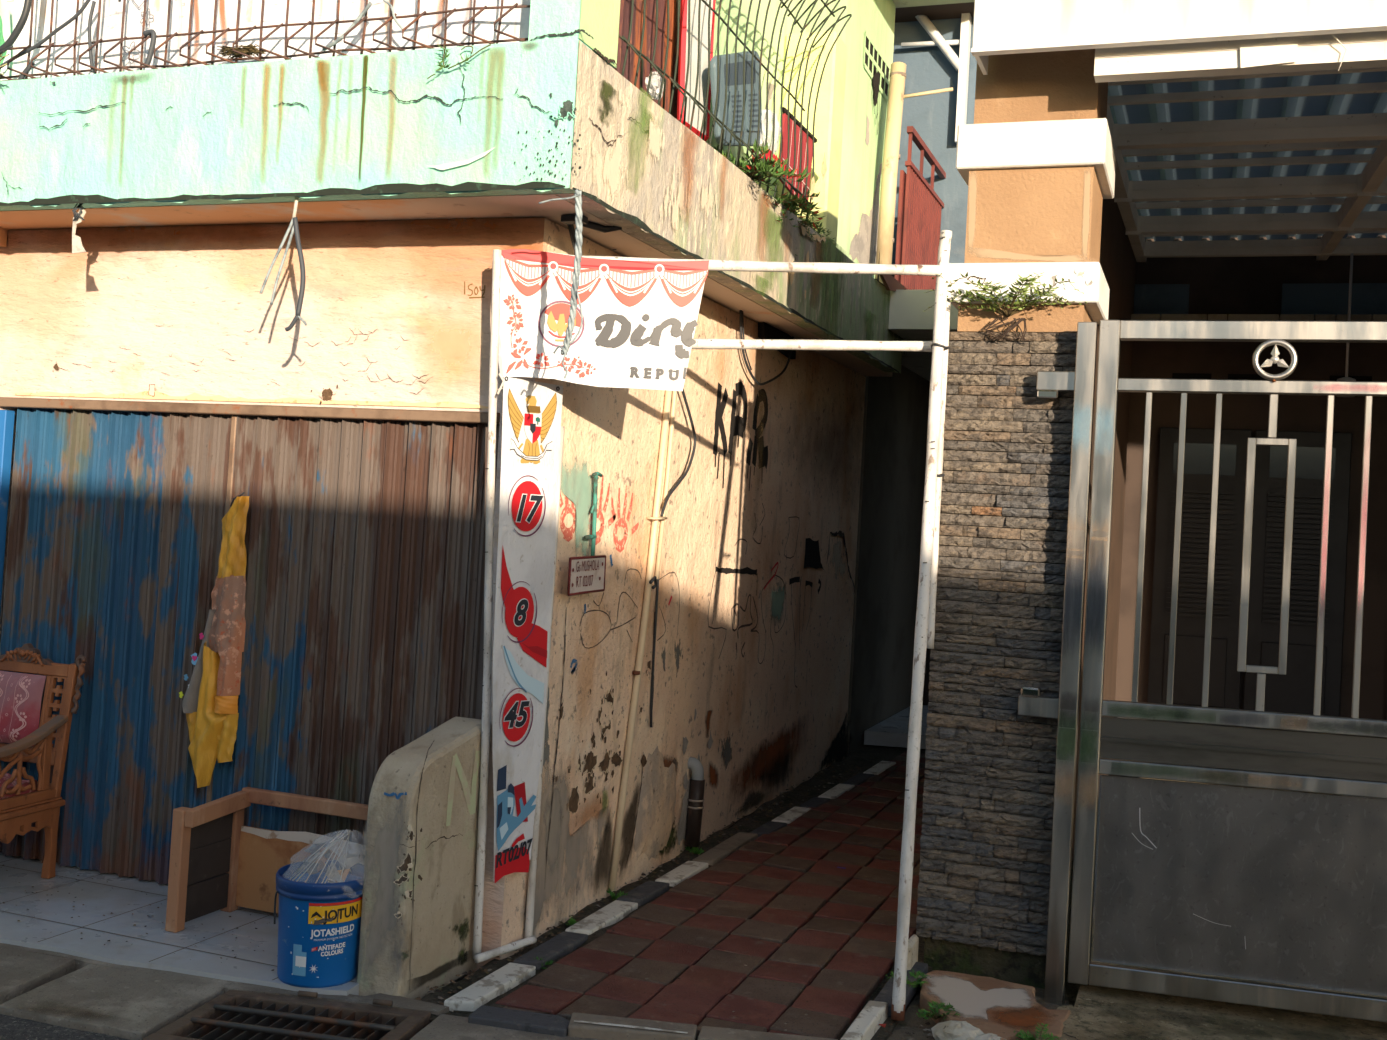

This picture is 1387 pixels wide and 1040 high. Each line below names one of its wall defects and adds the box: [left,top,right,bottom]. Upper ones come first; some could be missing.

rust [263,65,284,132]
rust [318,61,328,139]
rust [359,55,368,179]
crack [273,68,552,122]
leakage [632,91,653,148]
leakage [719,211,844,340]
flaking render [543,671,647,818]
flaking render [394,821,423,925]